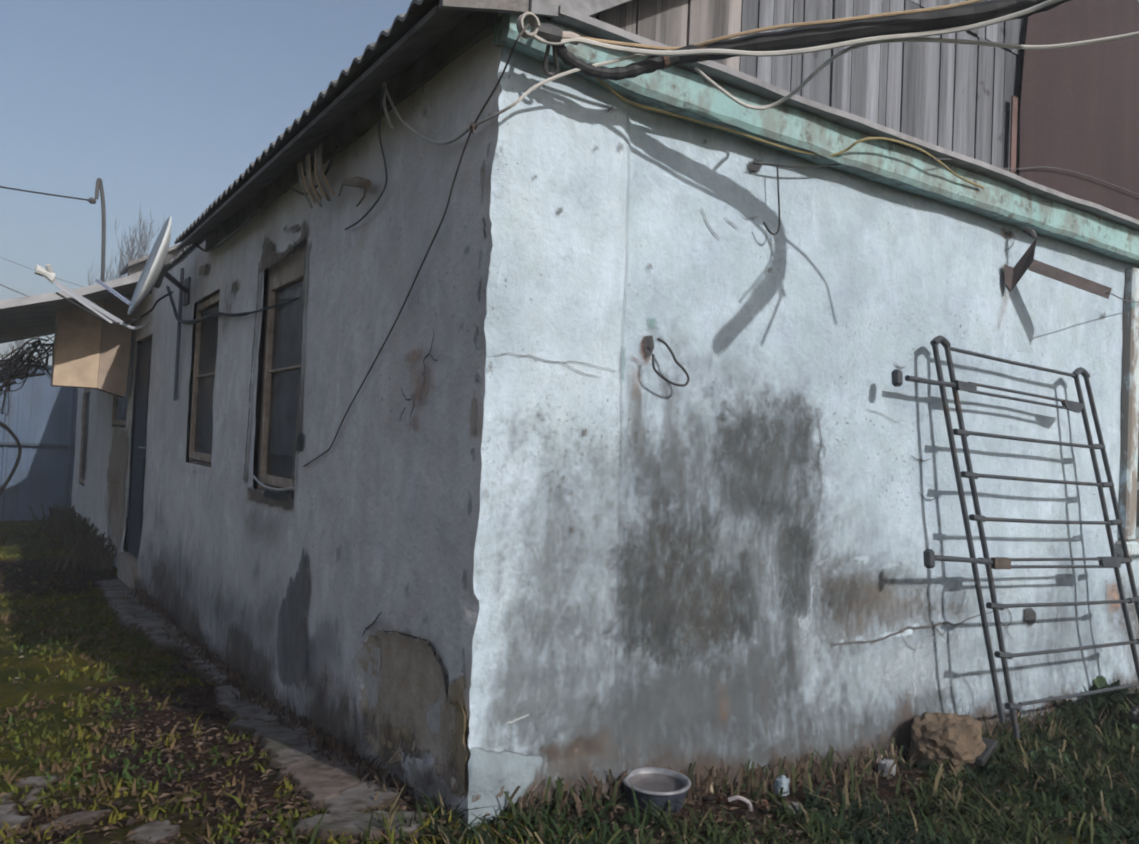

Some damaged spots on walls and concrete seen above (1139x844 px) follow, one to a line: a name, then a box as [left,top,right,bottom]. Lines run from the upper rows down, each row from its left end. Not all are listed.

flaking render [243,220,309,510]
damp [134,554,480,822]
flaking render [342,629,468,798]
damp [496,415,952,813]
crack [831,608,1013,651]
damp [973,688,1081,735]